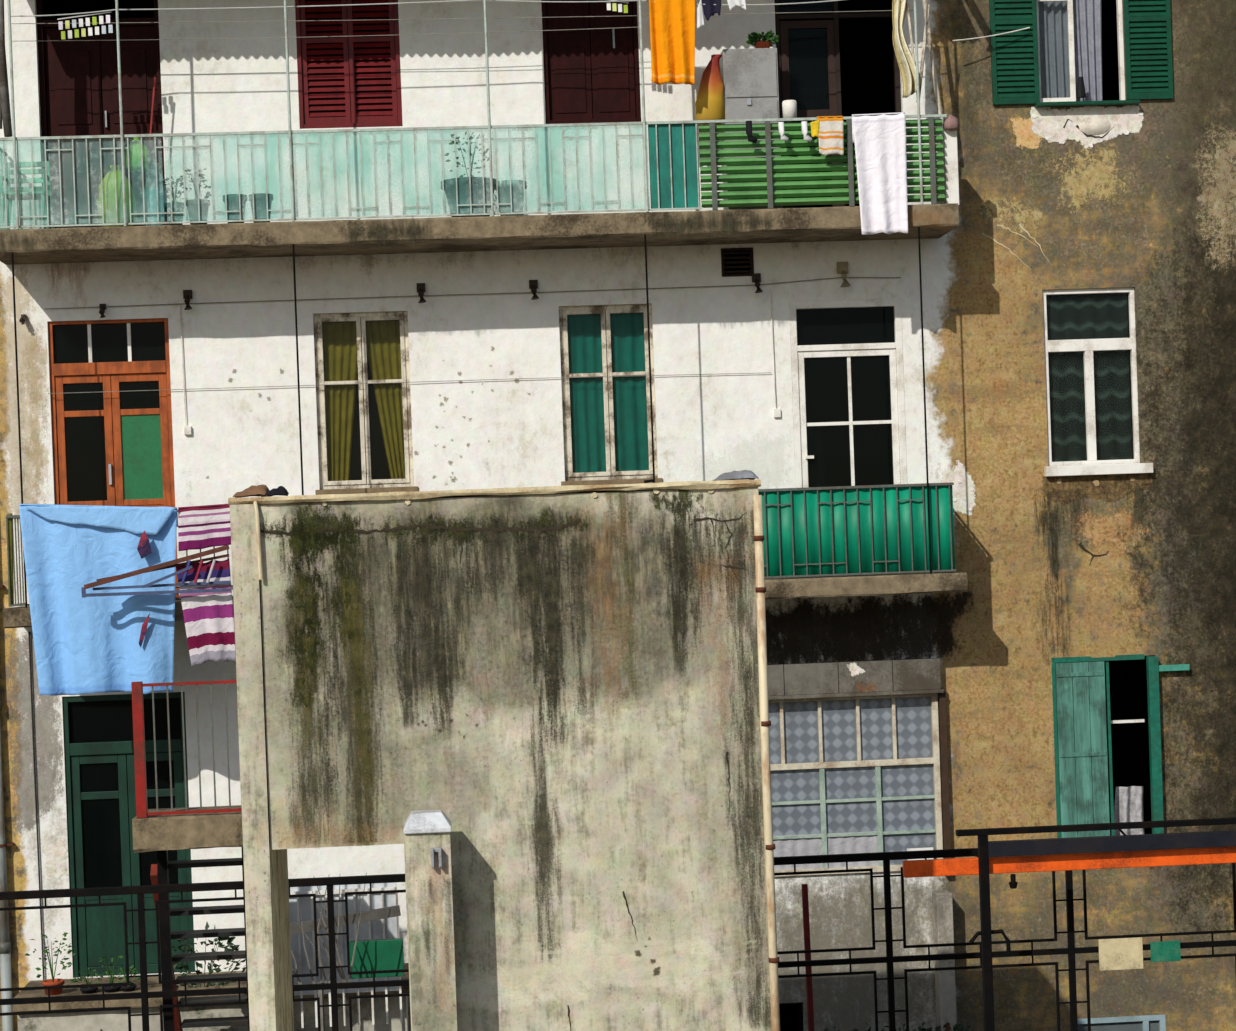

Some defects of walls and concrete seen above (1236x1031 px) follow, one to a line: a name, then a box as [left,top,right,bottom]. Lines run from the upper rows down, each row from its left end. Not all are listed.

spalling [1010,105,1144,213]
peeling [980,192,1045,243]
peeling [941,460,976,516]
leakage [280,516,594,962]
leakage [649,511,771,1027]